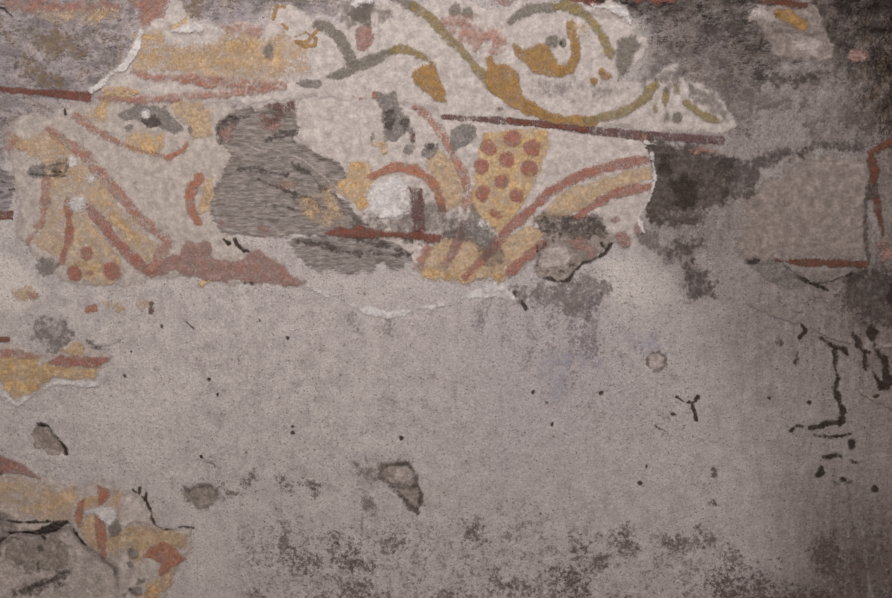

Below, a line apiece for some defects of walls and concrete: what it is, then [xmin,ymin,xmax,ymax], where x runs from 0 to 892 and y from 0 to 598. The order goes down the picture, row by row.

spalling [534,211,617,281]
crack [779,261,852,292]
crack [789,323,892,483]
spalling [31,422,68,455]
crack [0,518,86,546]
crack [132,486,194,531]
damp [277,522,390,598]
spalling [354,461,423,515]
damp [487,521,640,598]
damp [662,524,831,598]